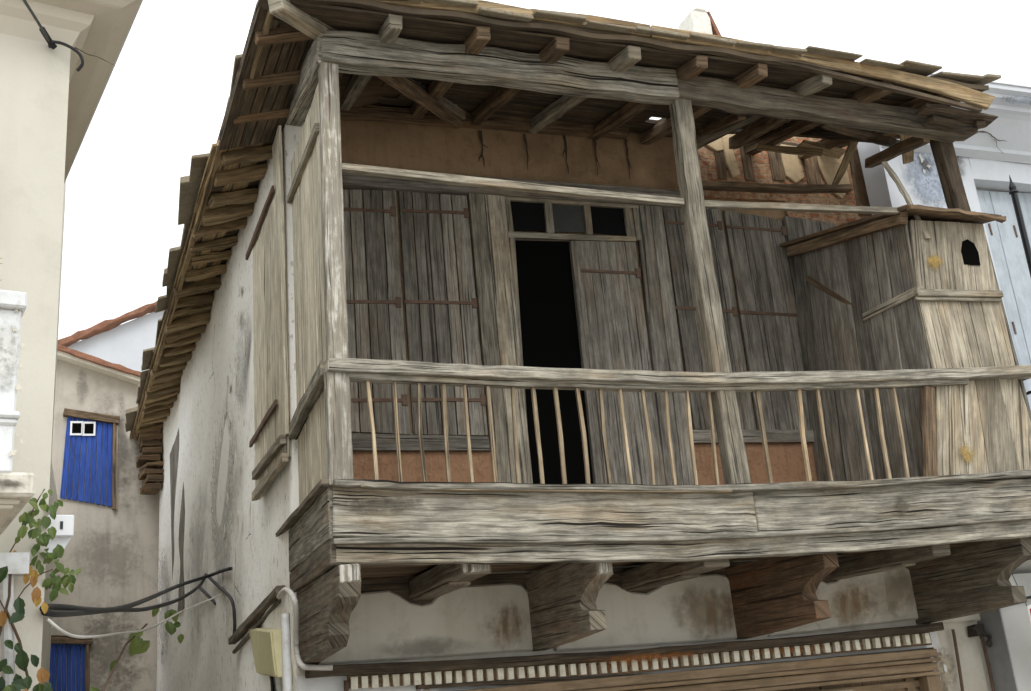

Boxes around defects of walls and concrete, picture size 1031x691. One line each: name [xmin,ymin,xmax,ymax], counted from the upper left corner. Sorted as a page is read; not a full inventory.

crack [478,131,488,167]
crack [561,135,569,174]
crack [624,139,632,179]